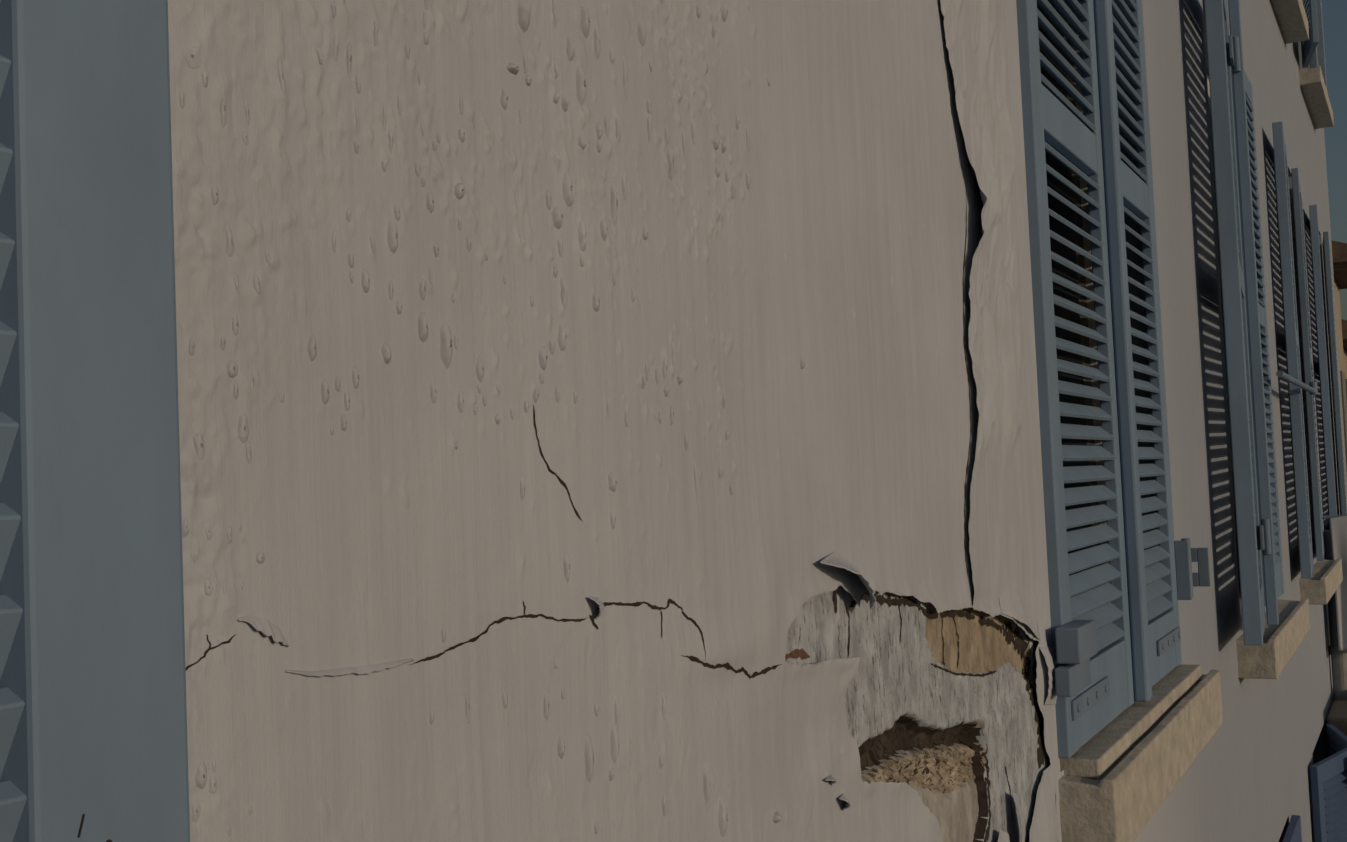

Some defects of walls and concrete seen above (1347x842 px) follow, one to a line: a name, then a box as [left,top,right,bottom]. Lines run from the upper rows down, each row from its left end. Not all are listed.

spalling [785,0,1057,842]
crack [186,634,236,671]
peeling [285,658,414,677]
crack [410,599,782,678]